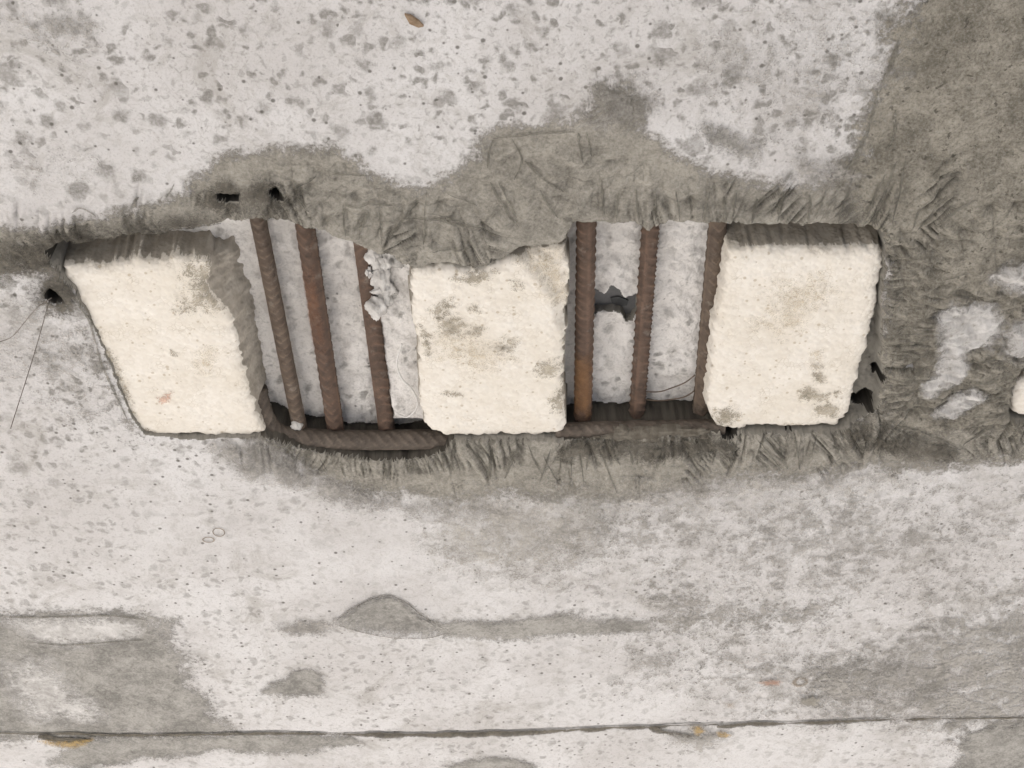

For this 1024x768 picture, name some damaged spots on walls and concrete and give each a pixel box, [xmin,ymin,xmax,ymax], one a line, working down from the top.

peeling [0,0,1024,504]
leakage [0,607,365,768]
crack [0,717,1024,743]
leakage [417,455,1024,768]